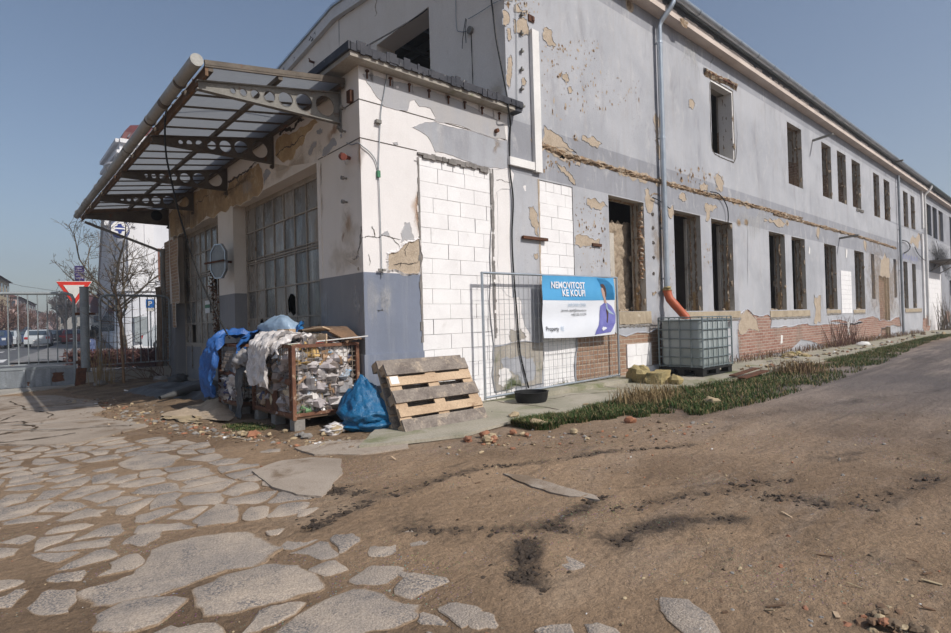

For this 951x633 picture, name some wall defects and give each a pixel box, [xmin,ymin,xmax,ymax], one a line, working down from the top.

peeling [502,0,539,42]
peeling [505,54,527,88]
peeling [541,26,639,120]
spalling [662,0,951,207]
spalling [275,119,338,163]
spalling [169,163,271,328]
crack [353,226,418,268]
peeling [362,74,544,393]
peeling [528,125,661,317]
peeling [667,167,724,222]
flaking render [575,323,663,381]
flaking render [725,291,931,360]